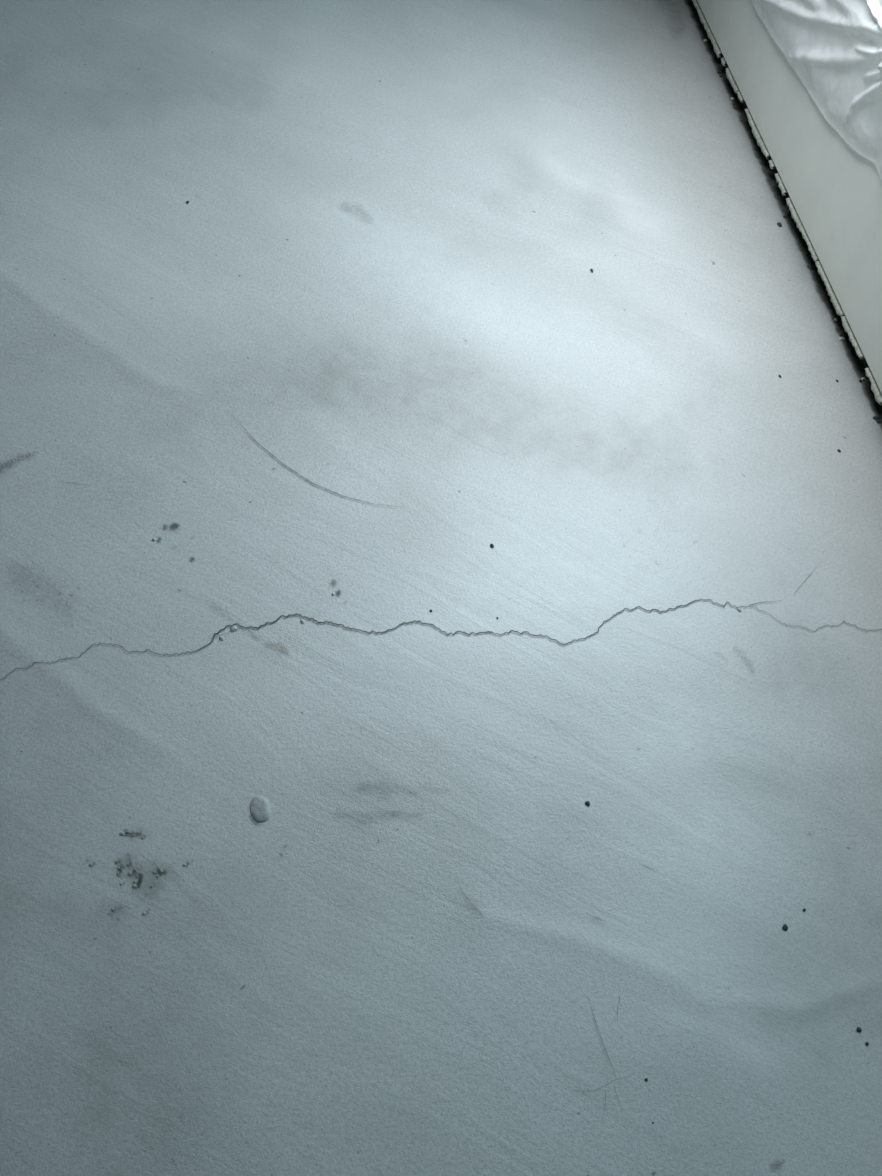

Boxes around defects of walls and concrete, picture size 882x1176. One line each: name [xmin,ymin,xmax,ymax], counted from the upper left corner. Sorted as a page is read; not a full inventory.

crack [0,598,881,680]